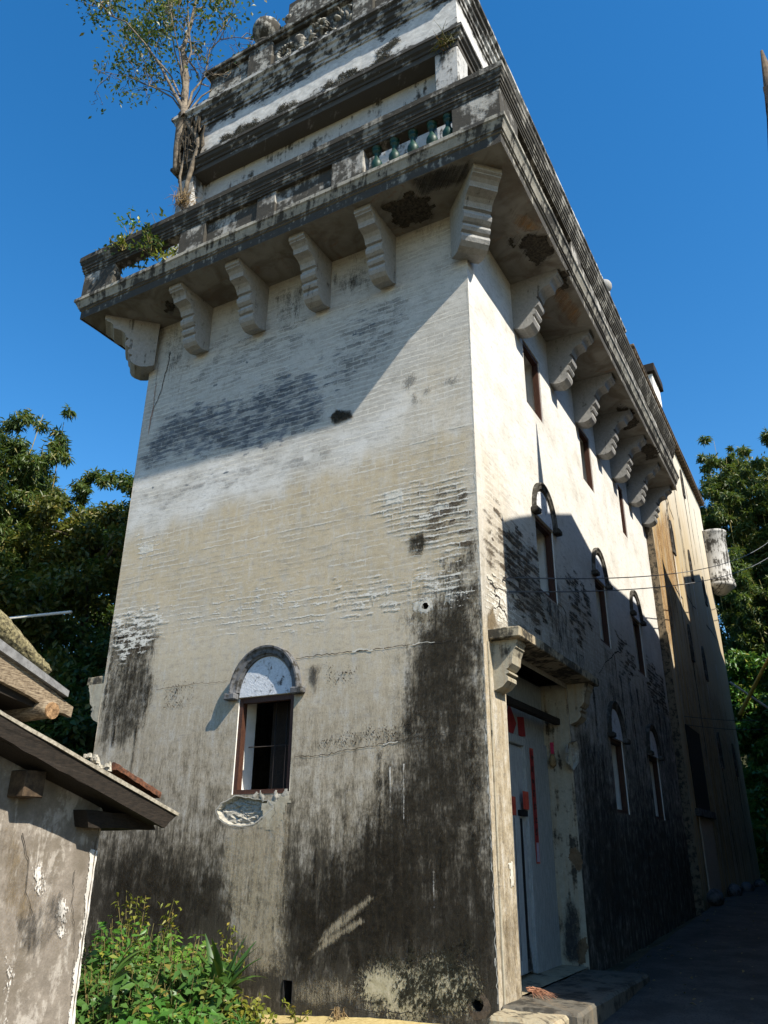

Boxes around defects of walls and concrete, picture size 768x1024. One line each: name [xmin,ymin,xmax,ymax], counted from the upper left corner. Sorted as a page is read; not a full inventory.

water stain [102,626,156,767]
flaking render [110,287,548,1022]
crack [296,638,467,659]
water stain [291,544,514,991]
water stain [577,676,688,941]
flaking render [32,864,46,896]
flaking render [56,898,69,938]
water stain [564,903,581,962]